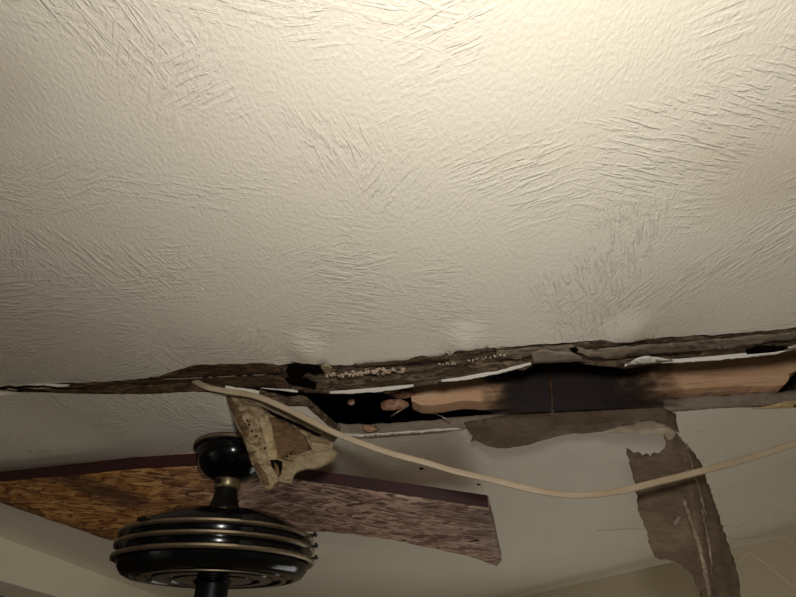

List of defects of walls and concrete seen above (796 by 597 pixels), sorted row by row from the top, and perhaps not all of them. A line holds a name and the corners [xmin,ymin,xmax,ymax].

crack [0,385,87,393]
leakage [495,361,654,413]